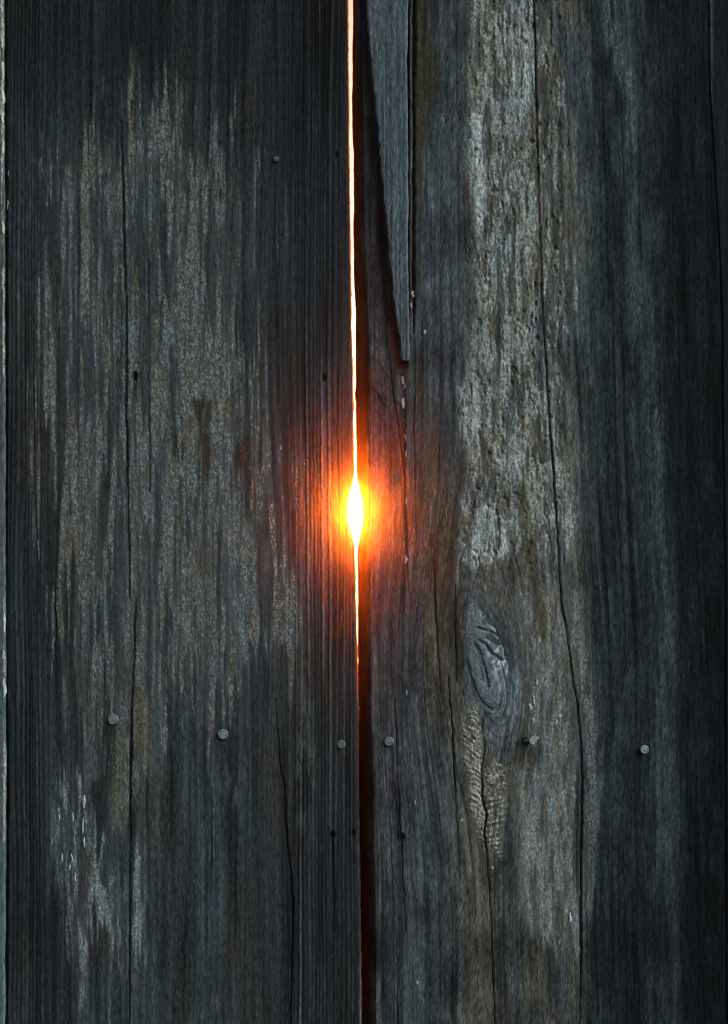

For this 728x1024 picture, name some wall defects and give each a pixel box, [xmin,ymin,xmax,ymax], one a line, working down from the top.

crack [274,700,294,1024]
crack [387,0,496,1024]
crack [532,0,583,1024]